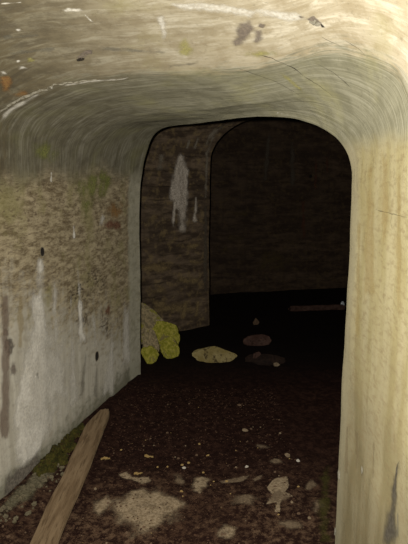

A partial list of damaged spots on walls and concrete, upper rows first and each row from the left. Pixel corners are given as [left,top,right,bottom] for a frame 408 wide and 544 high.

leakage [170,154,188,231]
leakage [71,284,87,341]
leakage [0,291,77,466]
leakage [384,464,398,542]